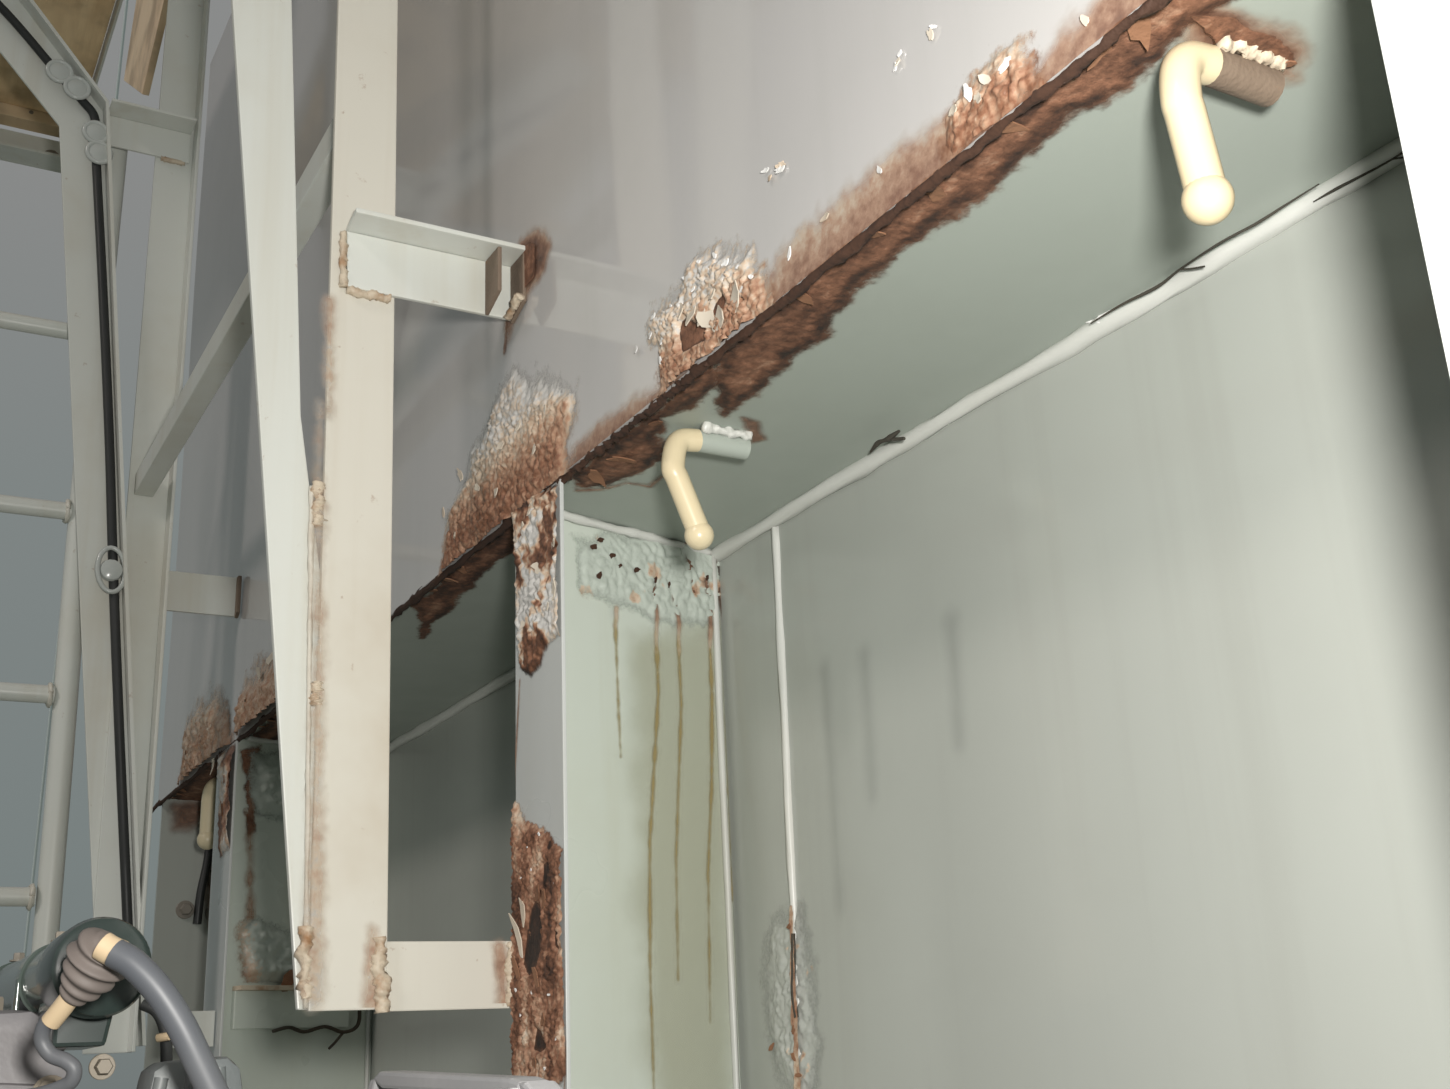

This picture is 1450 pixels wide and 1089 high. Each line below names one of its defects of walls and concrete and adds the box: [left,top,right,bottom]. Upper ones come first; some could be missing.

rust [1188,8,1303,77]
rust [765,0,1147,309]
peeling [1002,121,1030,133]
rust [520,230,551,293]
rust [503,320,512,354]
spalling [634,240,775,399]
rust [566,373,686,470]
rust [742,417,765,442]
rust [308,708,322,1003]
rust [365,936,376,1008]
rust [495,801,566,1089]